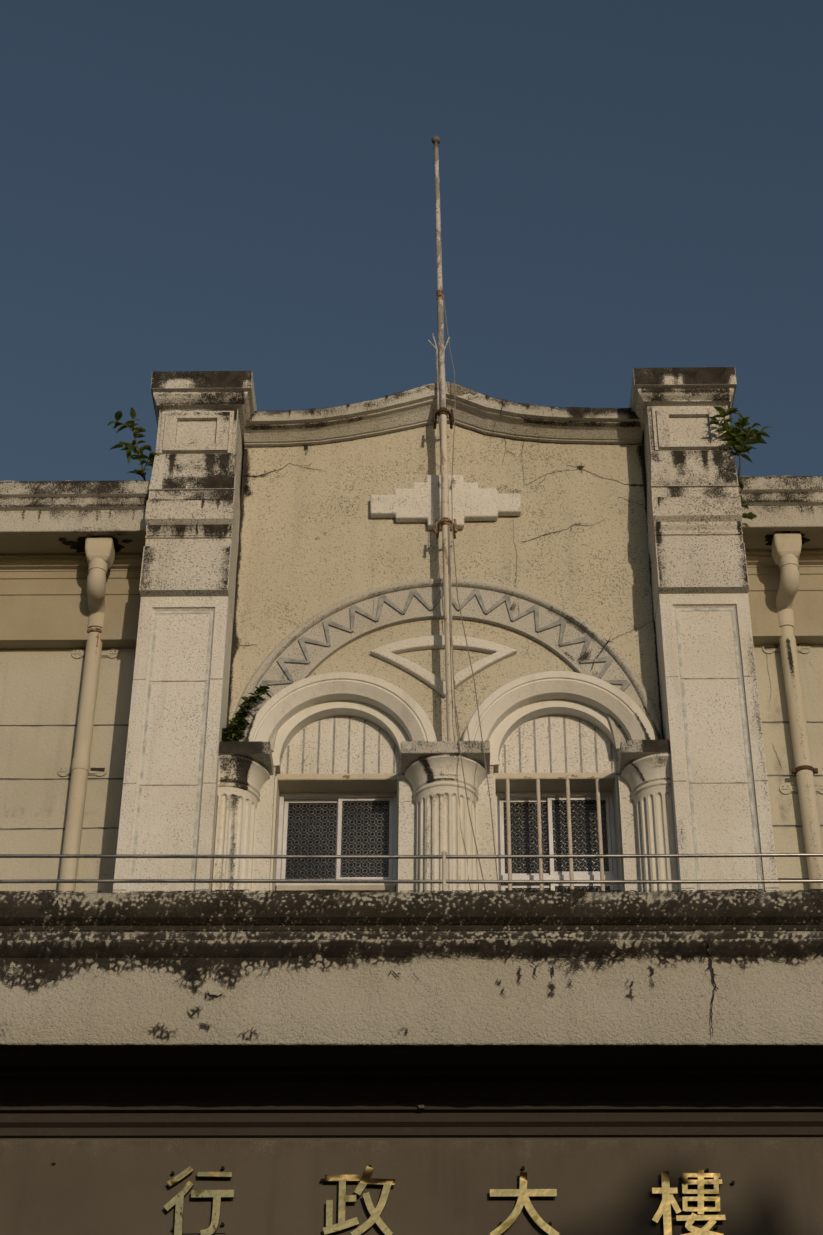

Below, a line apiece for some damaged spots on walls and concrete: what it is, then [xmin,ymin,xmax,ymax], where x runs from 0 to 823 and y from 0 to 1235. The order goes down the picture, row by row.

crack [466,395,642,588]
water stain [0,367,823,1030]
crack [706,958,718,1036]